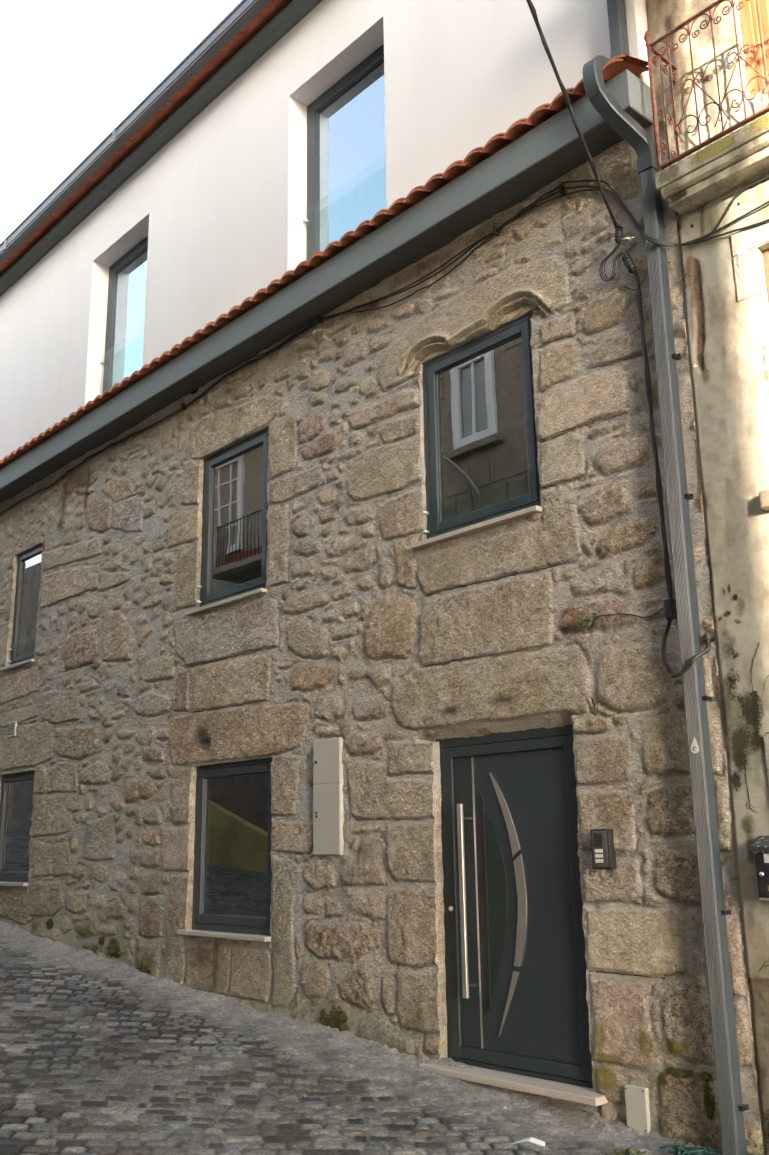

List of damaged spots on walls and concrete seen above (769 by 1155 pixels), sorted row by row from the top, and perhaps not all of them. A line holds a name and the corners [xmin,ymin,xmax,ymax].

water stain [706,544,767,792]
crack [737,643,769,814]